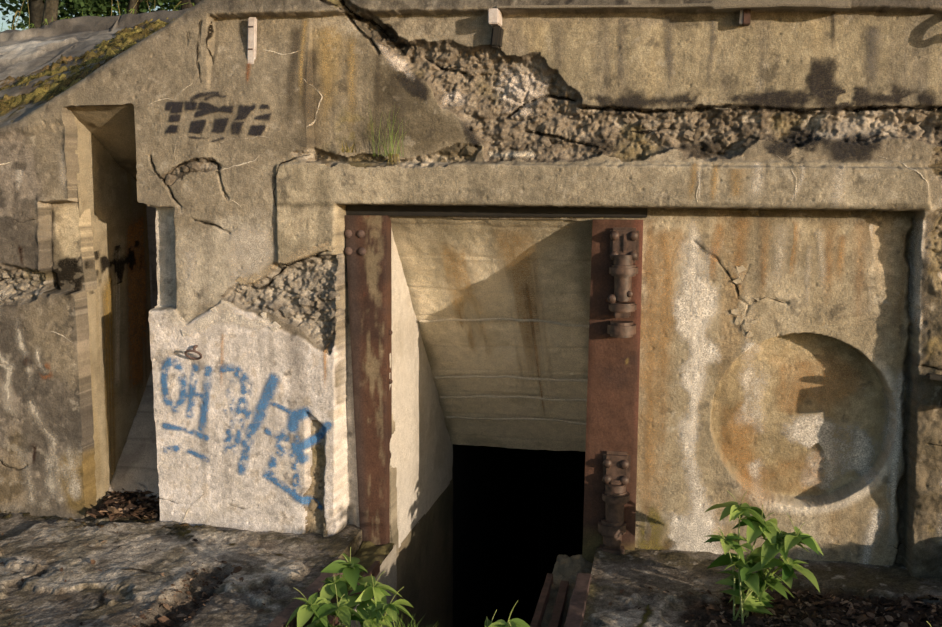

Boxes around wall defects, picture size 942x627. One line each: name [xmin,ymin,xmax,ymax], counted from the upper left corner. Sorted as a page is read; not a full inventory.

spalling [291,0,942,186]
leakage [590,93,697,114]
leakage [731,27,935,113]
crack [150,136,318,223]
leakage [767,128,880,198]
spalling [0,266,57,305]
spalling [179,243,347,356]
peeling [731,265,759,337]
spalling [924,215,942,293]
leakage [0,354,13,410]
leakage [668,227,723,554]
leakage [29,401,80,501]